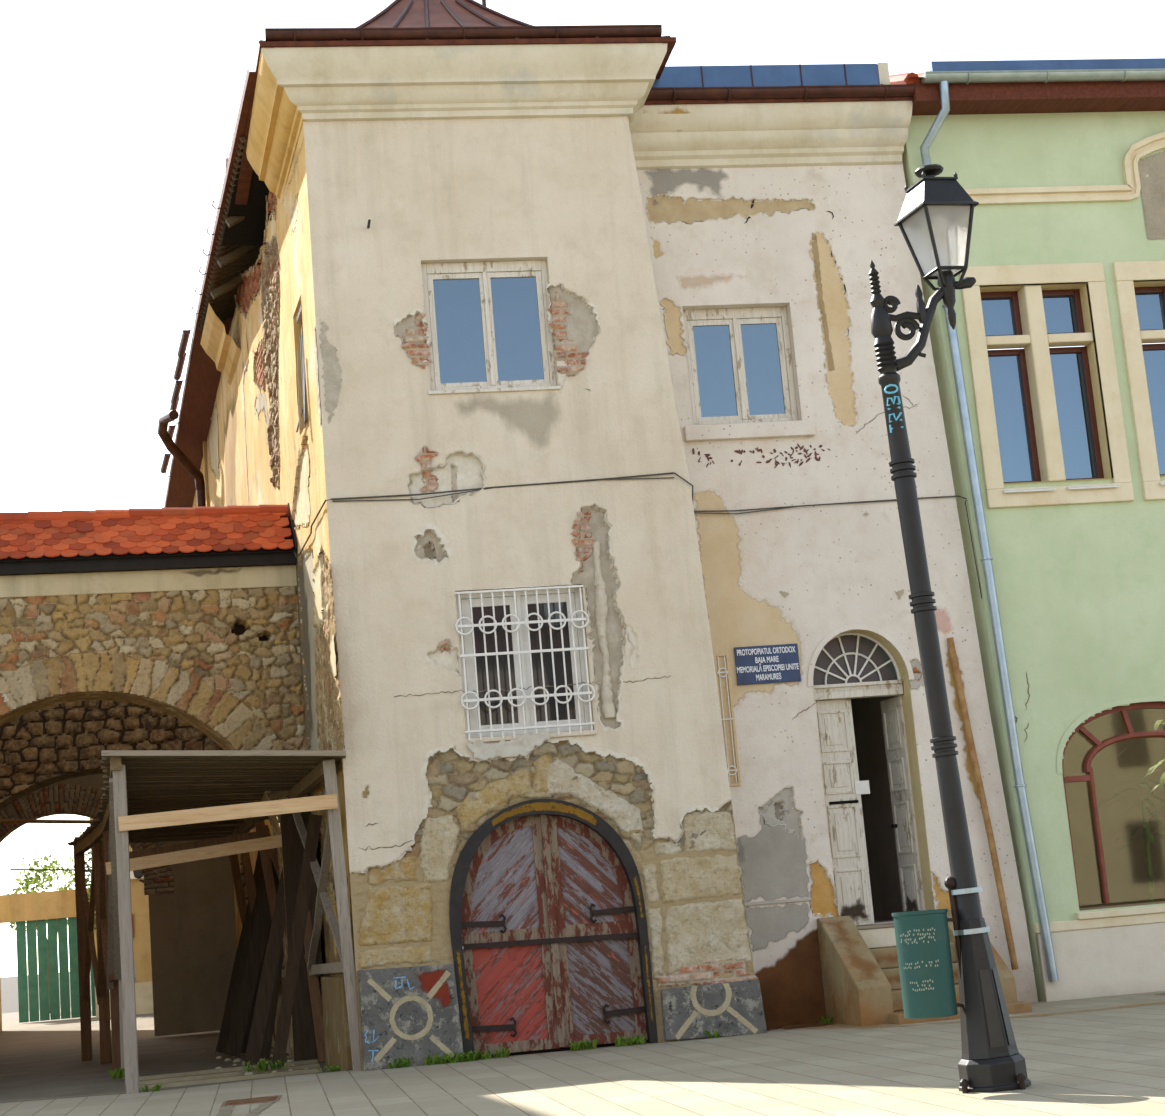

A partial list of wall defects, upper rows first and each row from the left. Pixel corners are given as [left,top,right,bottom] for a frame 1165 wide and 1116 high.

peeling [645,194,815,224]
spalling [234,191,299,319]
flaking render [394,308,433,369]
flaking render [546,282,601,386]
peeling [810,232,858,426]
flaking render [408,445,486,507]
flaking render [410,522,454,569]
flaking render [571,511,598,573]
peeling [312,546,345,750]
flaking render [758,786,803,838]
flaking render [350,730,758,1071]
peeling [809,860,868,920]